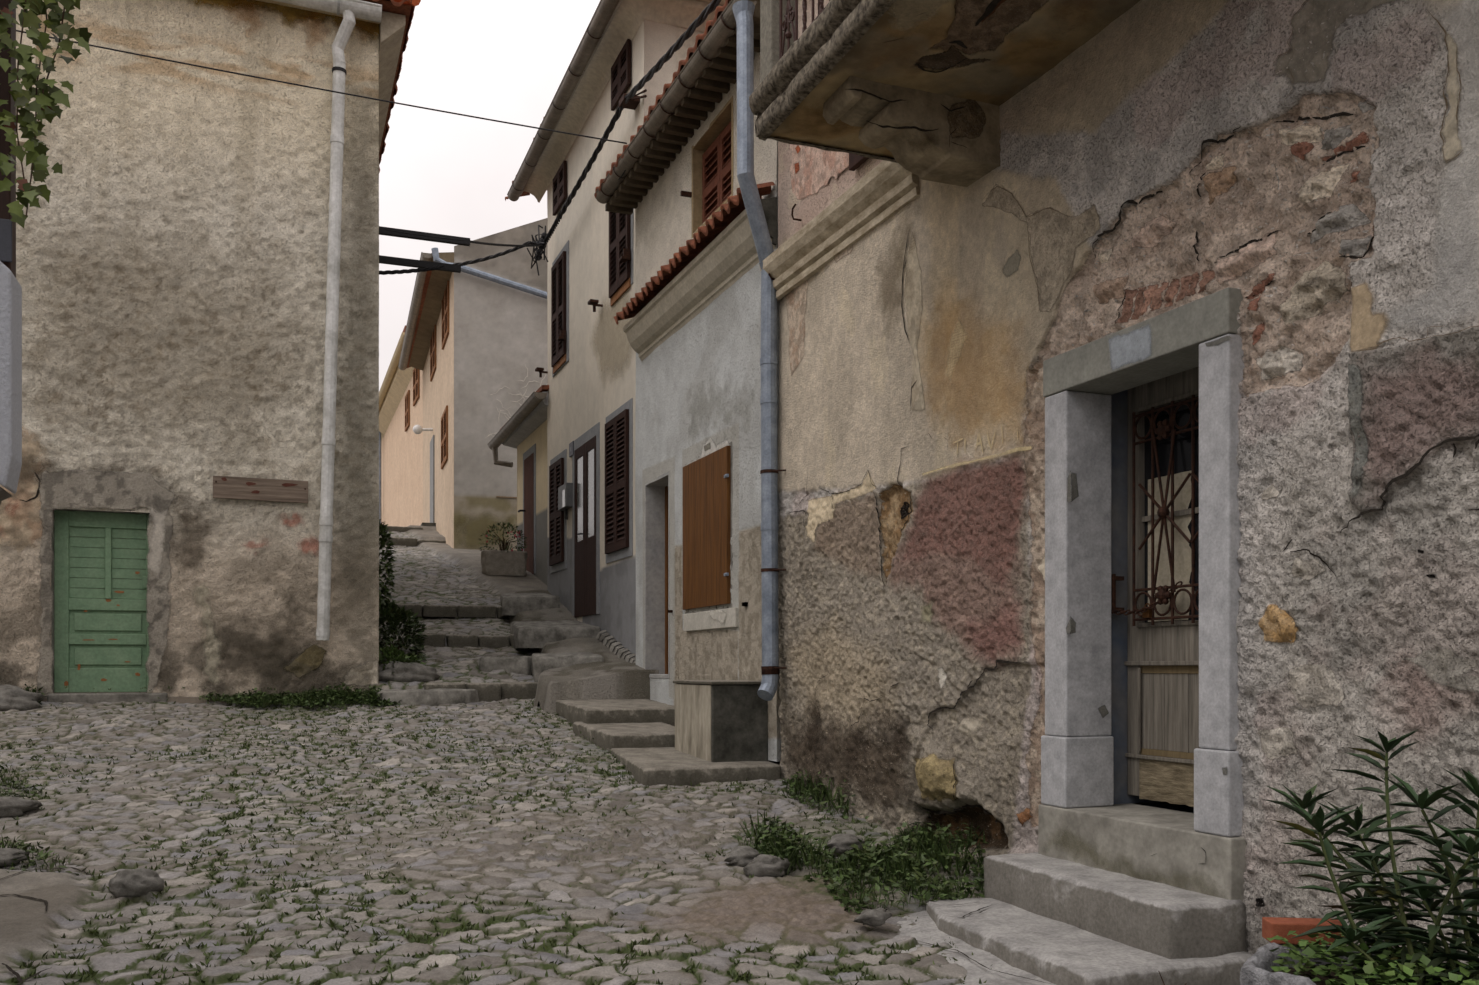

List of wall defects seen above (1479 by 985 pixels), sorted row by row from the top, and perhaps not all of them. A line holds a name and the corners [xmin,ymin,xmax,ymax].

spalling [915,0,1048,70]
crack [1272,0,1365,165]
crack [983,186,1068,311]
crack [1092,127,1331,263]
crack [1339,220,1374,259]
spalling [1016,0,1396,827]
spalling [805,473,913,579]
crack [1283,434,1479,576]
crack [923,660,1020,824]